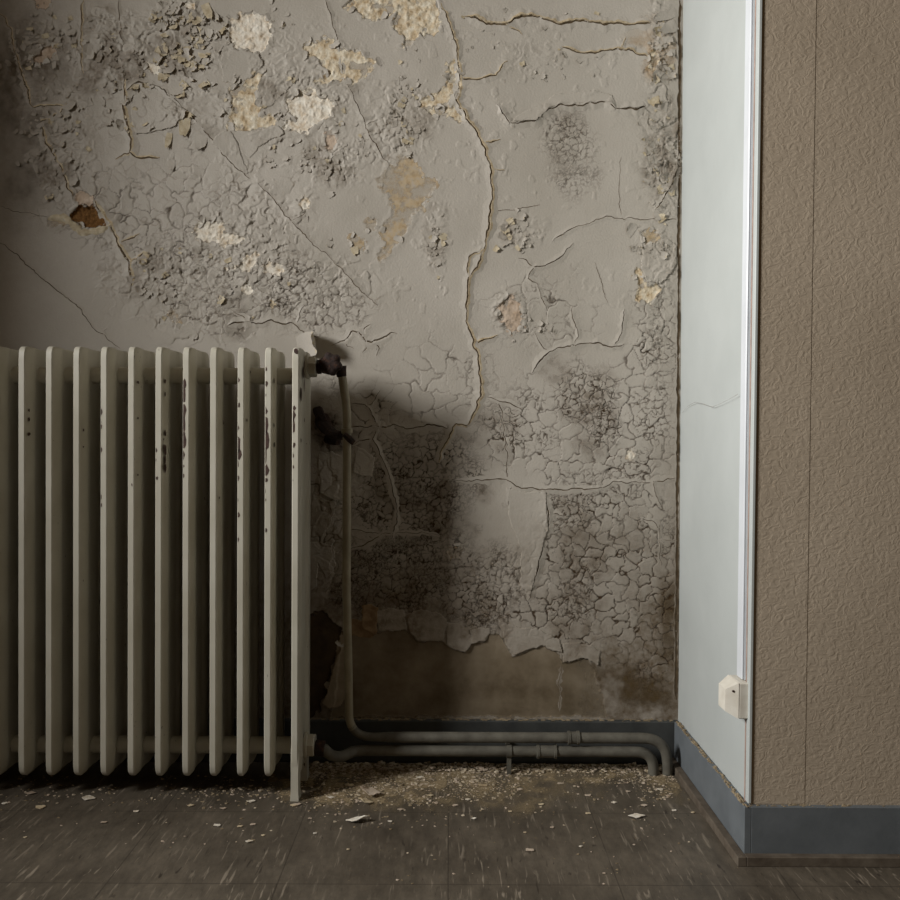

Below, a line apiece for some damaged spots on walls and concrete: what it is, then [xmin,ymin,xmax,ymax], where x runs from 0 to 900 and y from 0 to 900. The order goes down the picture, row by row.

crack [0,13,65,111]
peeling [98,0,382,181]
flaking render [343,0,466,261]
peeling [626,8,679,306]
crack [0,242,120,348]
flaking render [48,189,111,236]
crack [86,200,171,286]
flaking render [191,215,288,298]
crack [115,77,397,356]
peeling [296,331,317,356]
crack [319,0,738,700]
peeling [310,608,605,718]